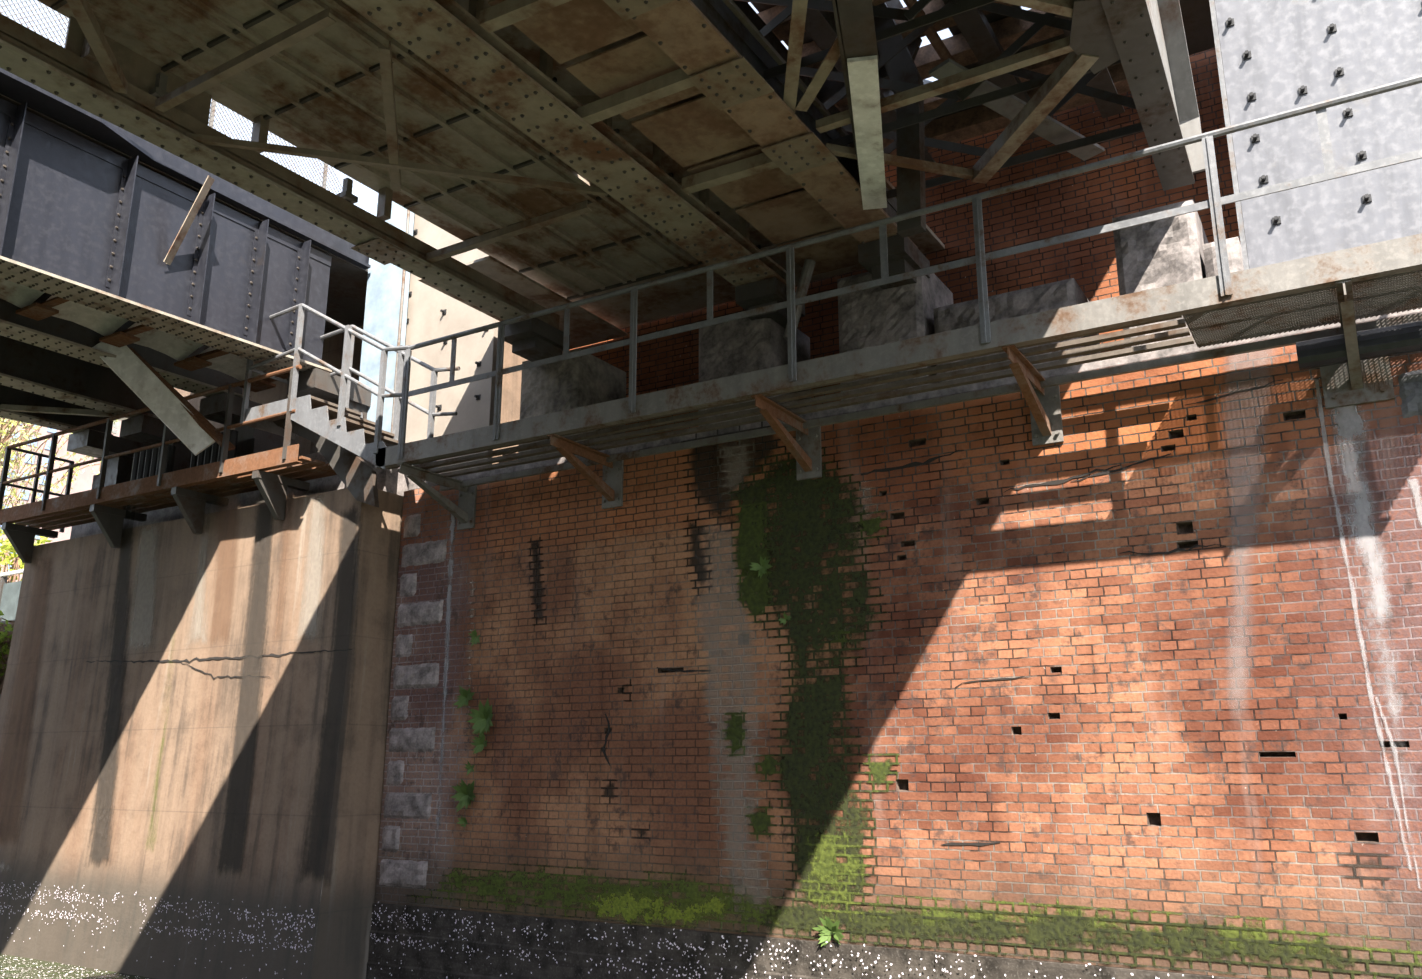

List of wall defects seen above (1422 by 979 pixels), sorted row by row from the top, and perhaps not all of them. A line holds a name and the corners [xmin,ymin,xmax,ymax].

damp [1409,479,1422,524]
damp [1315,379,1408,843]
damp [1338,843,1420,888]